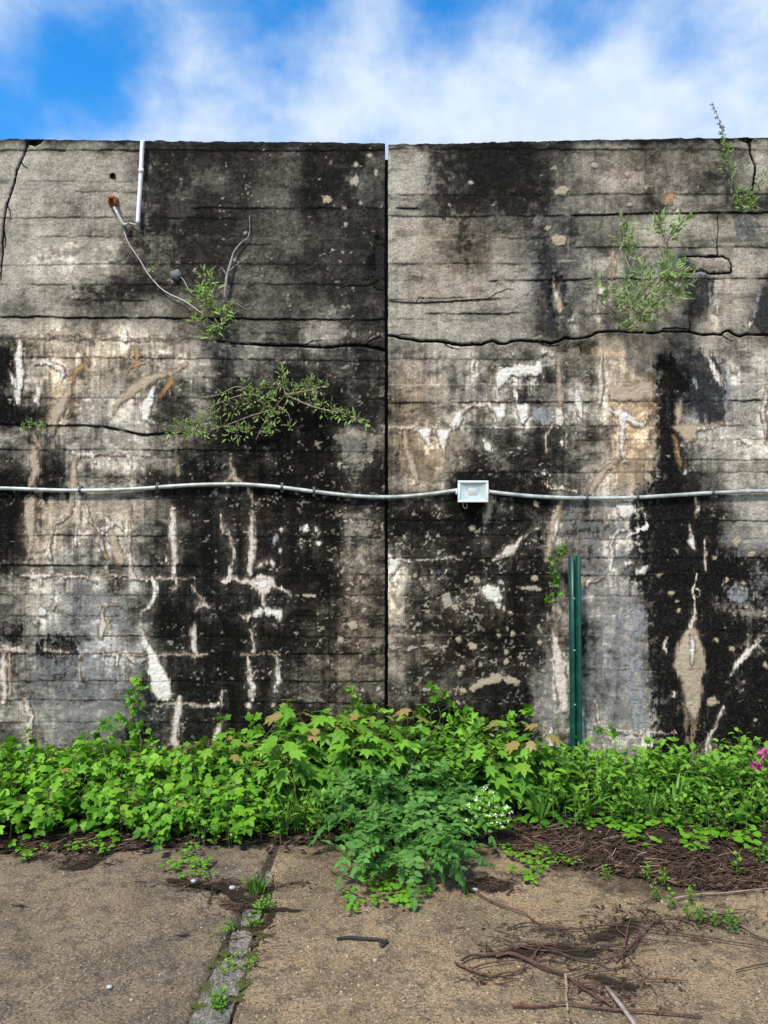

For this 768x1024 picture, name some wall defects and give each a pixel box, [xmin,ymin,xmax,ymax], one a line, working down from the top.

crack [0,141,33,279]
water stain [72,277,153,305]
water stain [133,145,198,280]
crack [217,317,768,355]
water stain [425,143,579,336]
crack [677,216,732,286]
water stain [219,461,292,709]
water stain [388,345,768,777]